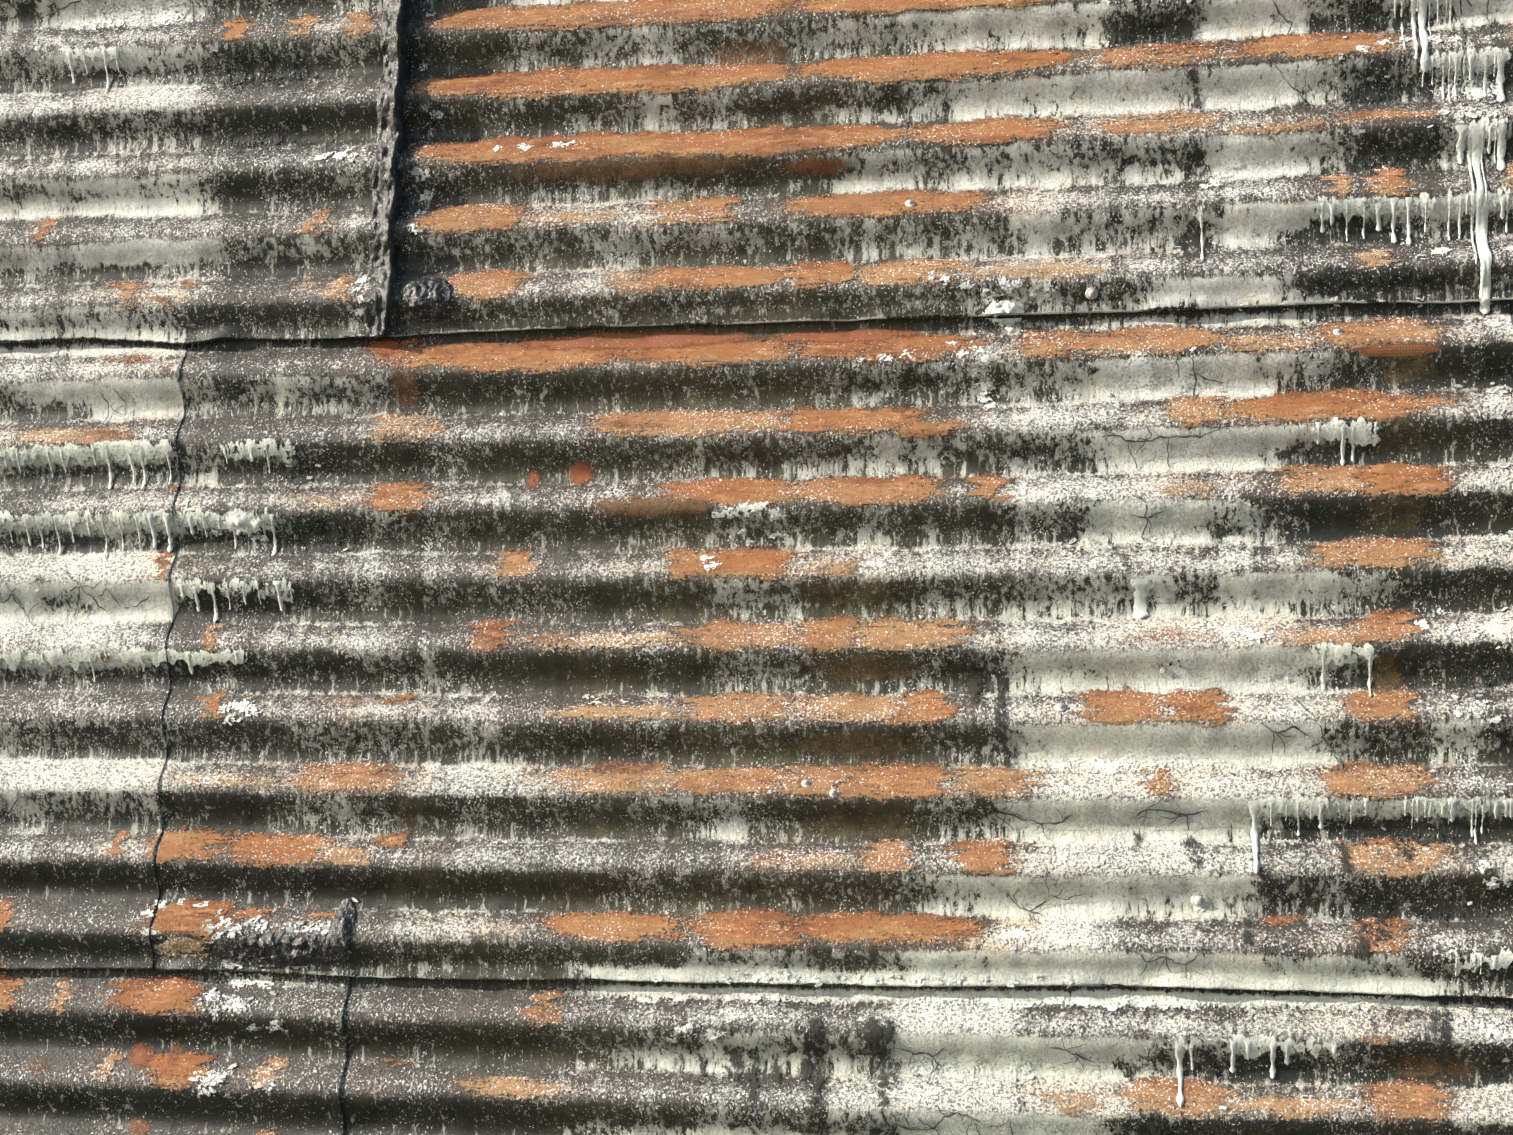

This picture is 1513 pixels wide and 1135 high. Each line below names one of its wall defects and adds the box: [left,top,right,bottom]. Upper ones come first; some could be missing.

rust [417,0,1054,37]
rust [407,29,1421,102]
rust [401,107,1444,183]
rust [408,186,1005,239]
rust [356,314,1453,379]
rust [1155,386,1475,503]
crack [0,570,151,625]
rust [464,612,988,658]
rust [503,688,962,731]
rust [505,756,1053,807]
rust [506,905,1020,957]
rust [1033,1028,1473,1129]